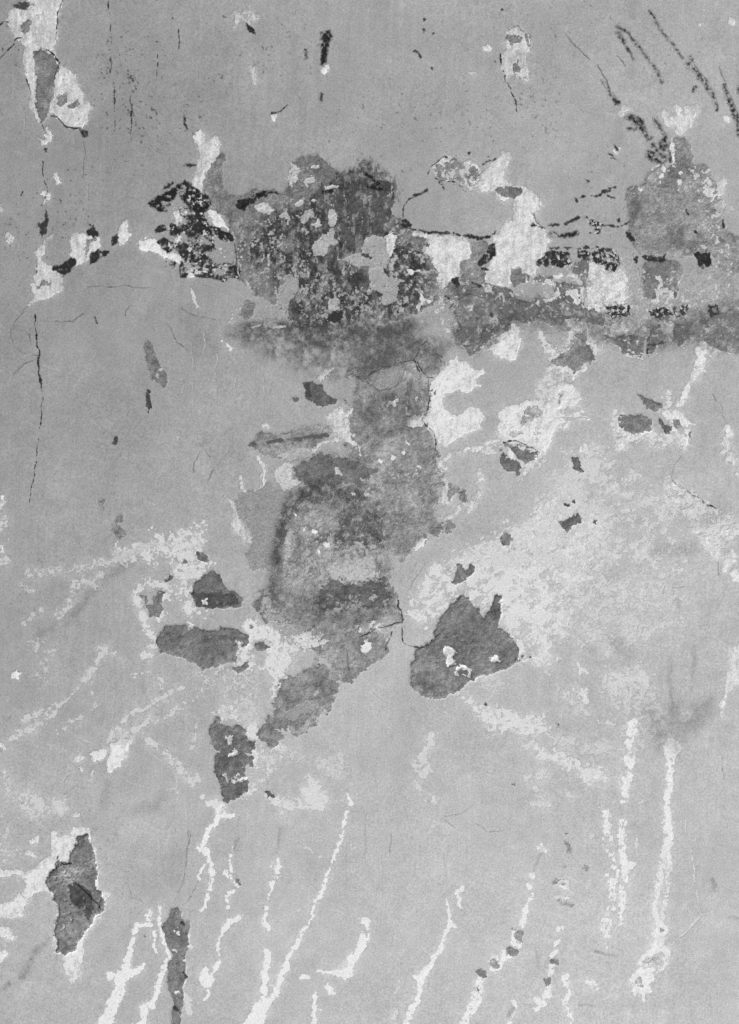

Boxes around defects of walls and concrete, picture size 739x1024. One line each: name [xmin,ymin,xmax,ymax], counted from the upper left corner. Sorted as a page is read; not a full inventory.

peeling [6,0,93,148]
peeling [482,25,531,82]
crack [24,315,42,502]
spalling [0,104,739,815]
spalling [0,768,111,984]
water stain [98,803,244,1024]
spalling [161,907,190,1024]
water stain [243,781,372,1024]
water stain [386,886,465,1024]
water stain [459,872,536,1024]
water stain [531,925,575,1024]
water stain [585,718,696,1023]